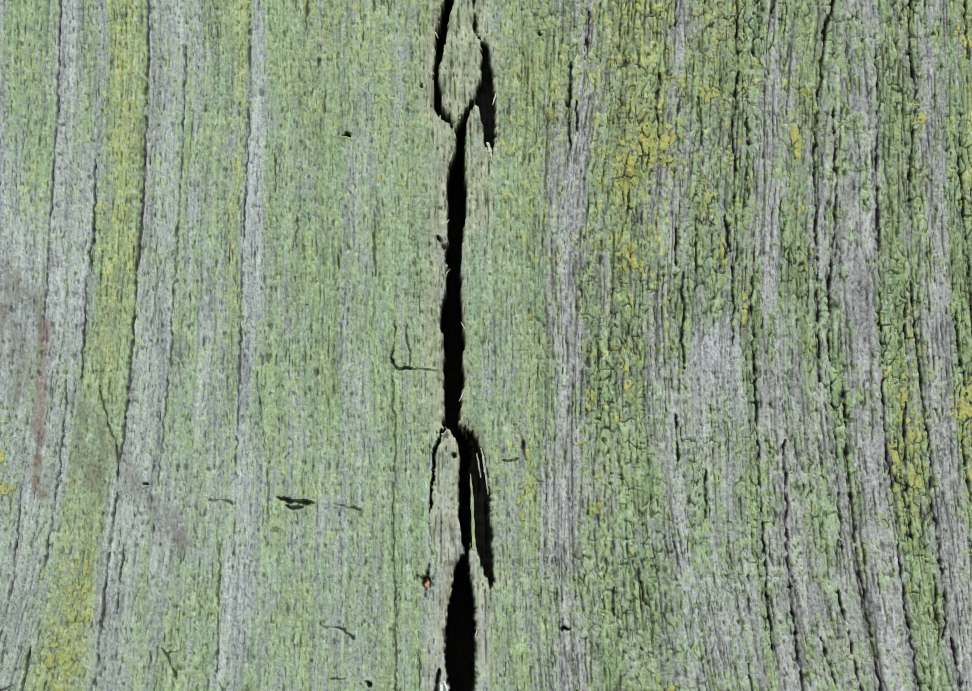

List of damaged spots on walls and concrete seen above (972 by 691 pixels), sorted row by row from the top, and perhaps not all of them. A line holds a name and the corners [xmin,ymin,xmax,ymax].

crack [389,0,527,691]